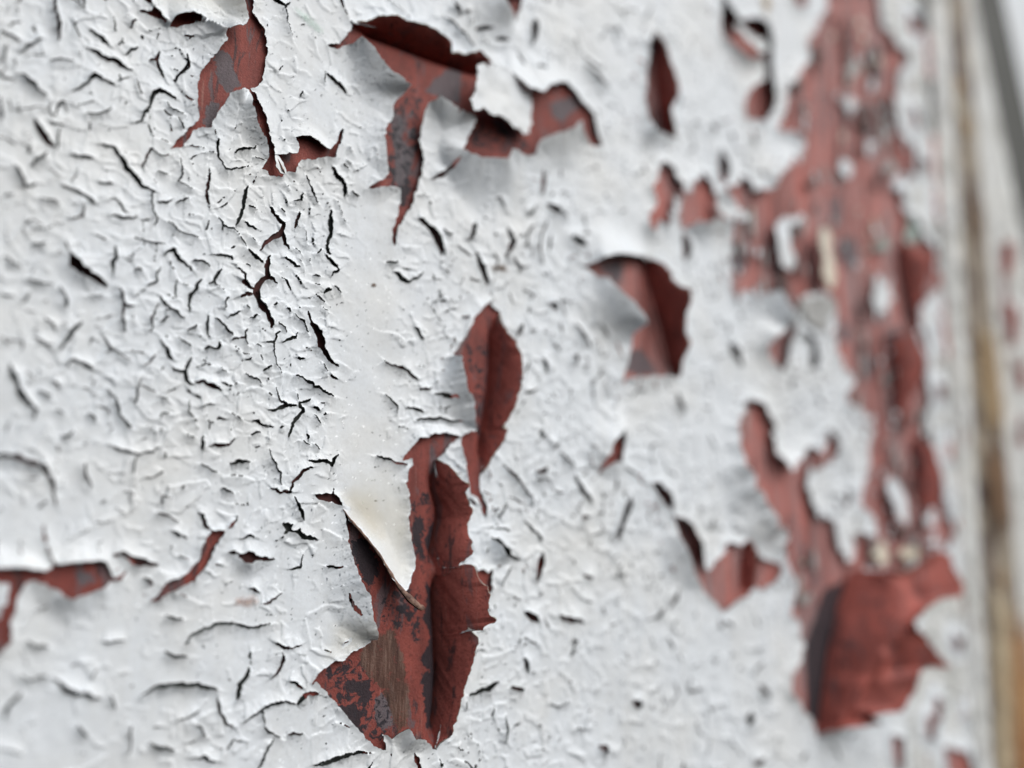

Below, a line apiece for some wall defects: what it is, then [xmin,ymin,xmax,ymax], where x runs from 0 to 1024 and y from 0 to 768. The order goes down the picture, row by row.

peeling [121,0,614,257]
crack [428,151,466,183]
crack [383,200,572,289]
crack [0,0,379,768]
crack [381,355,472,426]
crack [514,298,594,398]
peeling [559,0,976,768]
peeling [0,289,552,768]
crack [369,451,412,468]
crack [486,438,595,550]
crack [521,606,587,627]
crack [466,652,532,749]